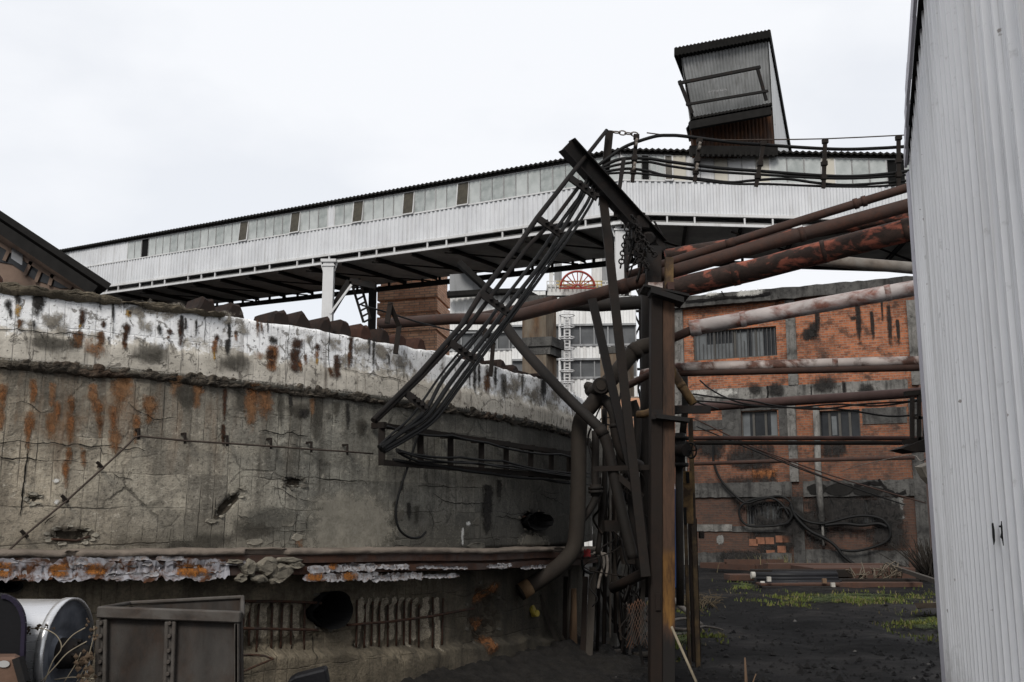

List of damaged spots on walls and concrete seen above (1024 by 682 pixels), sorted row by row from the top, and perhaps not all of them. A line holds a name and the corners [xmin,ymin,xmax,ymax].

corrosion [70,309,85,348]
corrosion [97,321,106,346]
corrosion [122,310,131,349]
corrosion [256,320,341,378]
water stain [851,302,900,344]
crack [261,430,305,439]
crack [0,404,174,517]
spalling [205,487,247,524]
crack [265,477,367,548]
water stain [461,479,502,544]
spalling [518,510,554,547]
peeling [0,524,247,594]